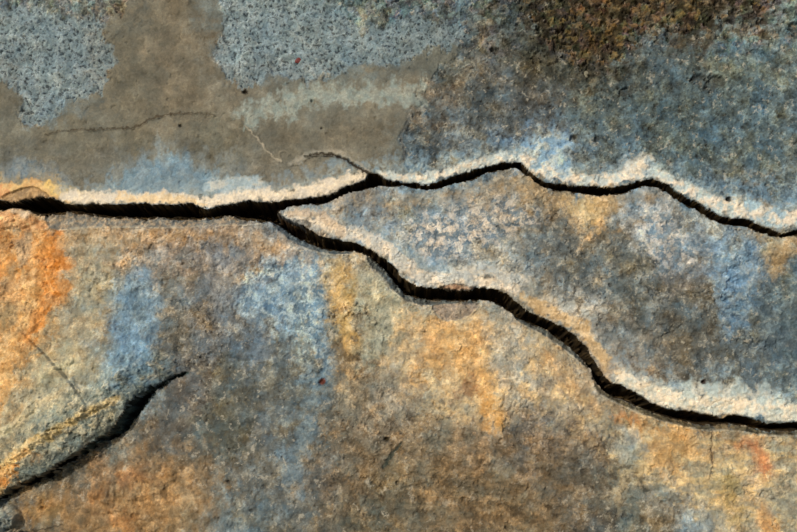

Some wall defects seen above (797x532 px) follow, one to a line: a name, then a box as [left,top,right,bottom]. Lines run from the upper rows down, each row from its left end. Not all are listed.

crack [44,110,216,136]
crack [399,112,412,161]
crack [0,125,797,481]